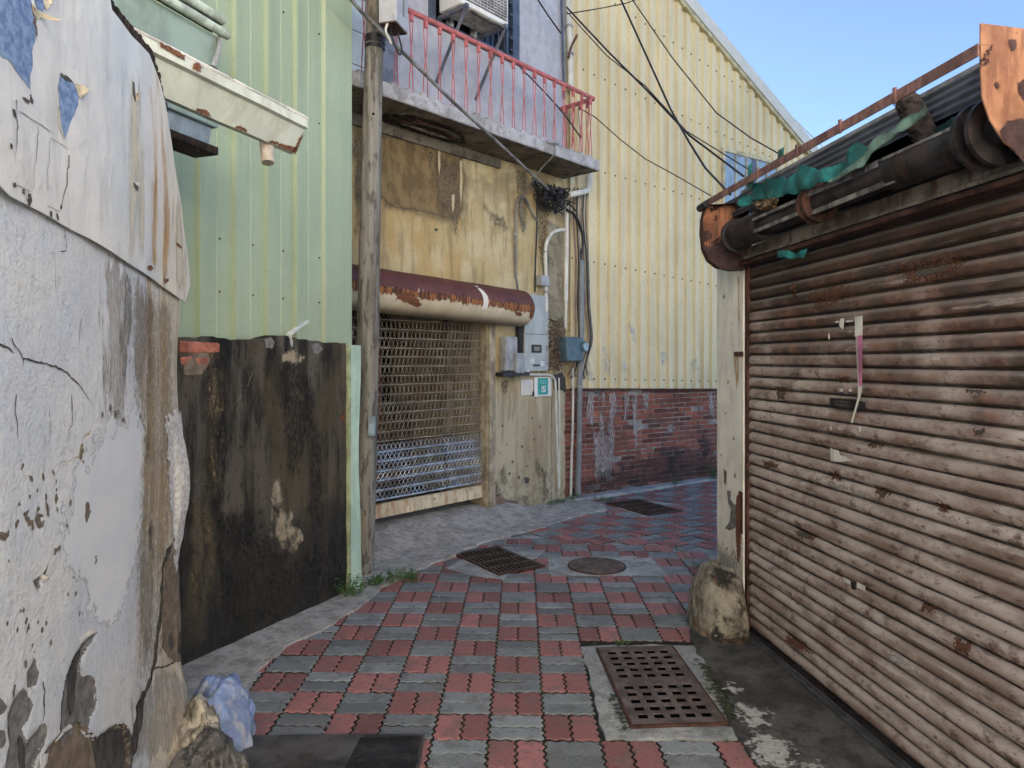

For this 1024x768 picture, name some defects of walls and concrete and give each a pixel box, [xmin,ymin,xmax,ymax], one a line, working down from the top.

peeling [0,0,61,104]
peeling [58,73,90,138]
corrosion [160,42,203,72]
corrosion [269,135,303,155]
corrosion [1000,118,1024,162]
corrosion [380,285,535,319]
crack [0,338,108,436]
water stain [99,259,173,675]
water stain [186,352,341,643]
water stain [572,391,717,493]
crack [136,522,181,714]
spalling [0,607,189,768]